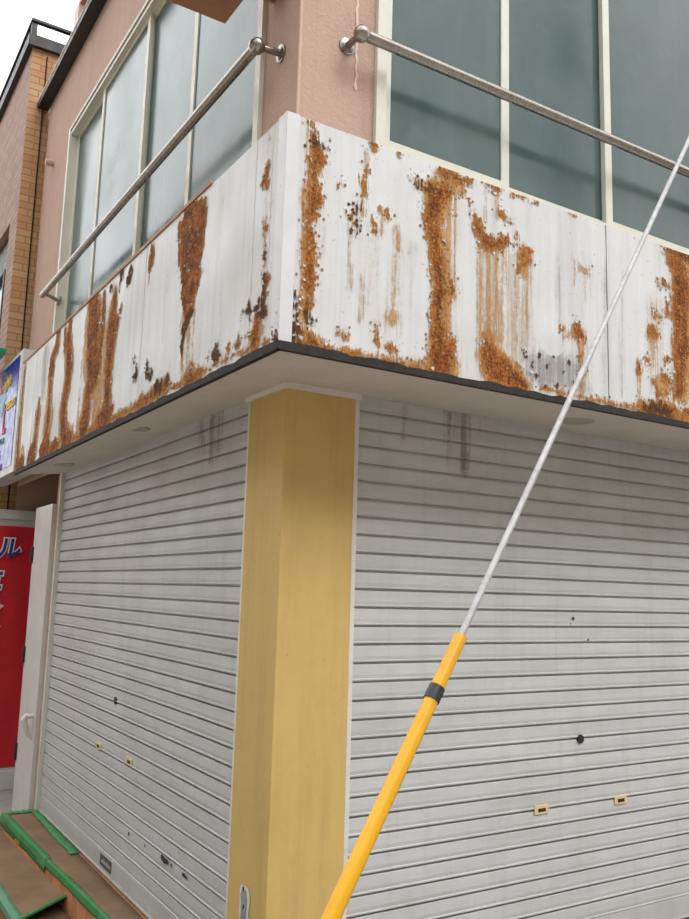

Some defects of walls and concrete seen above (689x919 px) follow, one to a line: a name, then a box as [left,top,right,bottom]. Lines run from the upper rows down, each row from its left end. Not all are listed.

corrosion [15,195,280,470]
corrosion [259,159,271,191]
corrosion [292,120,689,423]
spalling [239,884,250,919]